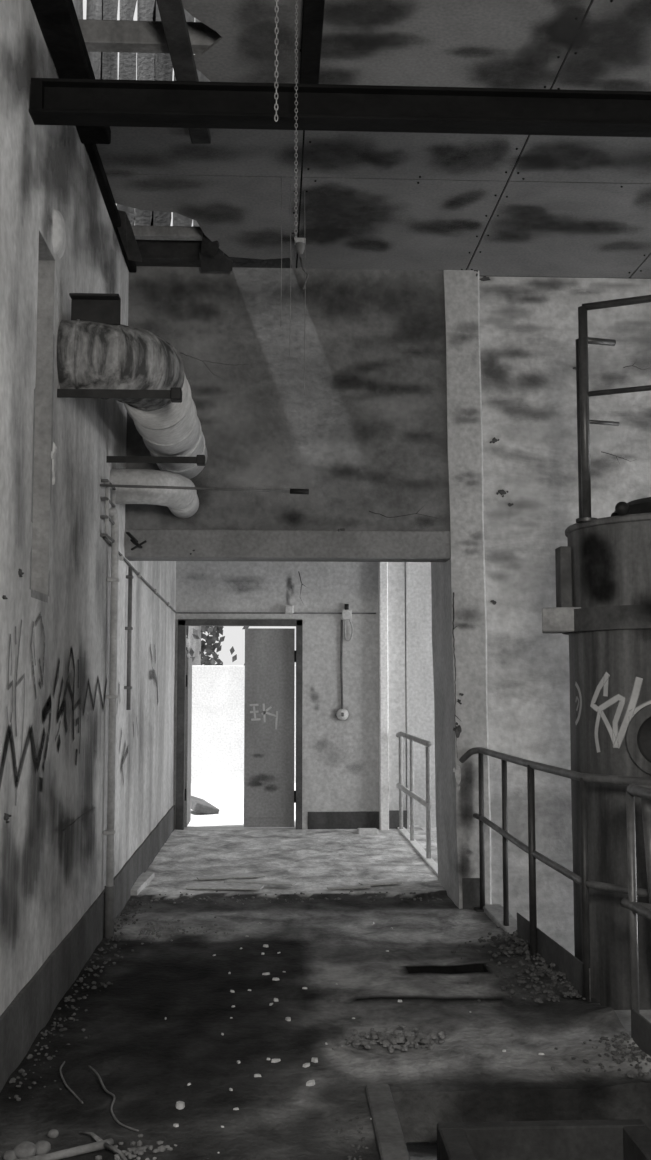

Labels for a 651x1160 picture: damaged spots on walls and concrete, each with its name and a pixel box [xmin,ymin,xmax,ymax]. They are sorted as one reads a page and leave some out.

water stain [321,1,405,58]
water stain [458,0,651,91]
water stain [289,142,394,168]
water stain [518,145,608,169]
water stain [296,186,388,249]
water stain [419,222,479,233]
water stain [498,207,619,240]
water stain [1,713,98,937]